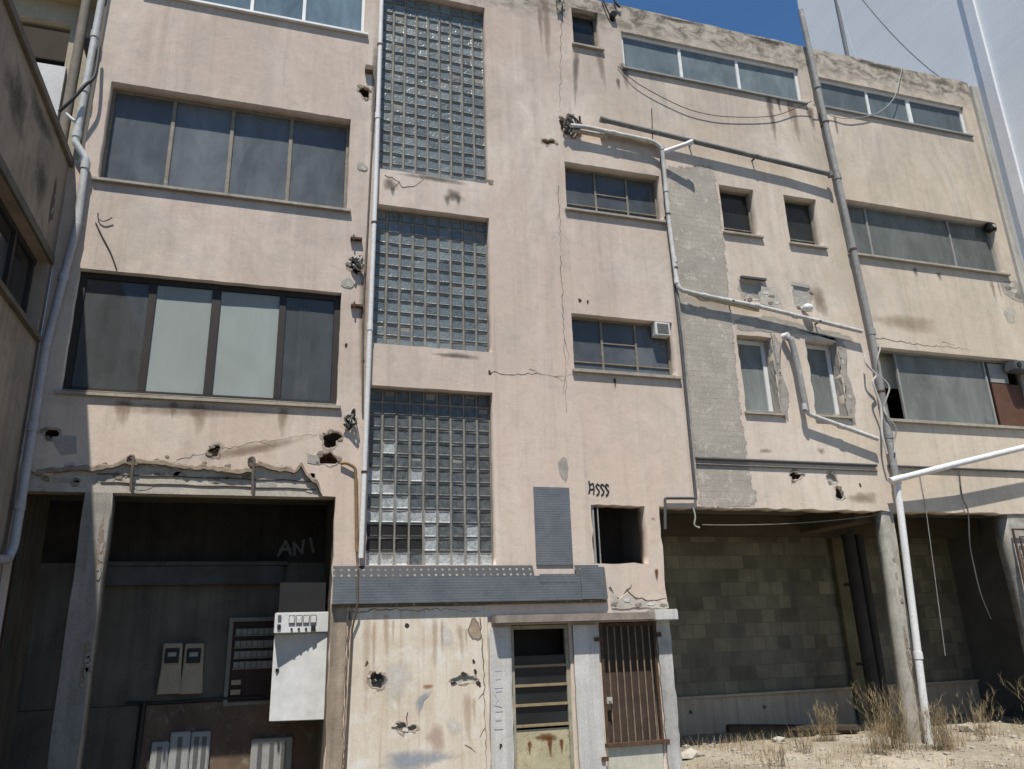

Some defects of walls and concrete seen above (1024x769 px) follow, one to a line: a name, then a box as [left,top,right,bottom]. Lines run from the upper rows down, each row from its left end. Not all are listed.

crack [493,186,573,411]
flaking render [734,285,856,425]
spalling [92,429,345,493]
hole [789,469,805,484]
spalling [826,471,847,501]
spalling [365,661,388,692]
spalling [448,659,481,687]
corrosion [528,734,563,753]